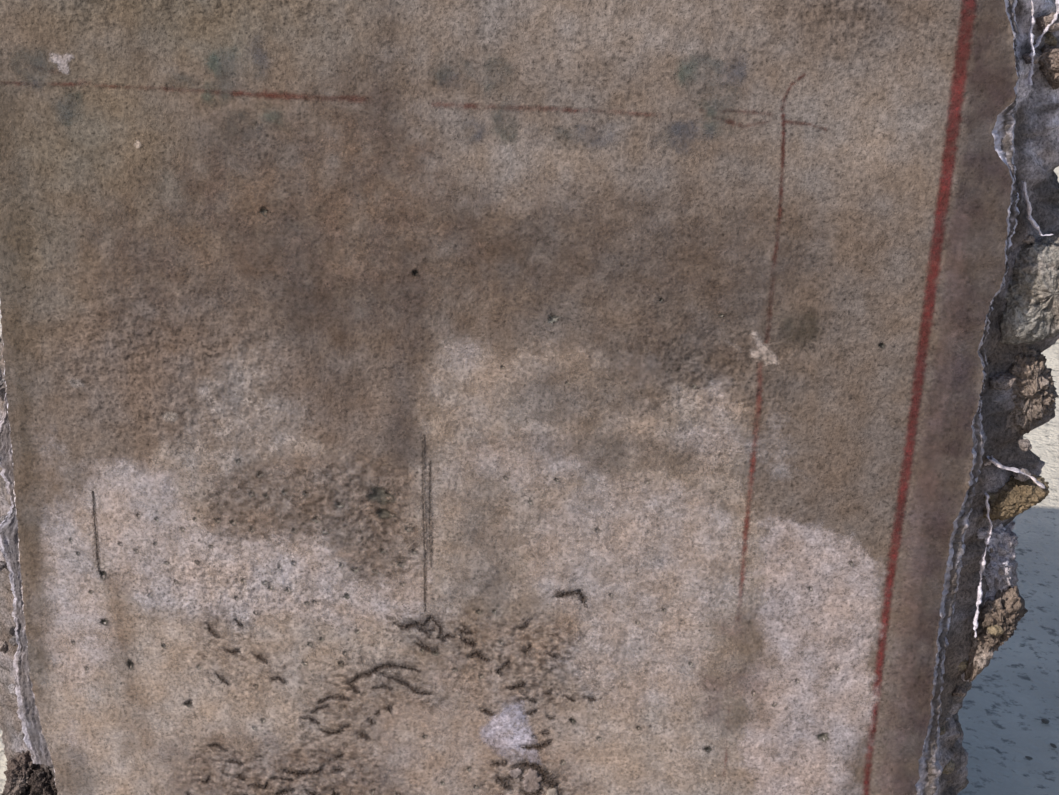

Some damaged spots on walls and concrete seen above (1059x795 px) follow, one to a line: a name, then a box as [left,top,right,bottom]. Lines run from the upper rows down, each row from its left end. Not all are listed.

spalling [915,0,1021,795]
crack [555,589,589,608]
crack [318,614,579,704]
crack [490,758,574,795]